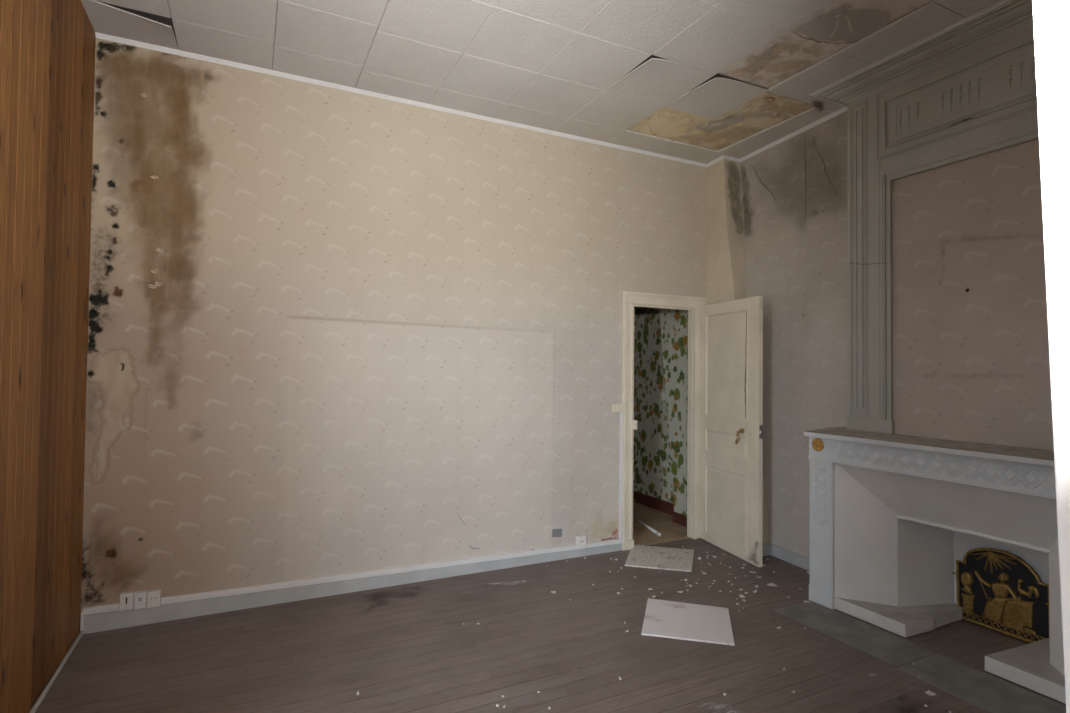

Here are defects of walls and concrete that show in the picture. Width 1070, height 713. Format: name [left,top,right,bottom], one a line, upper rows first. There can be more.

mould [97,42,135,60]
peeling [629,0,932,150]
mould [92,165,115,191]
mould [106,205,119,275]
mould [88,287,122,352]